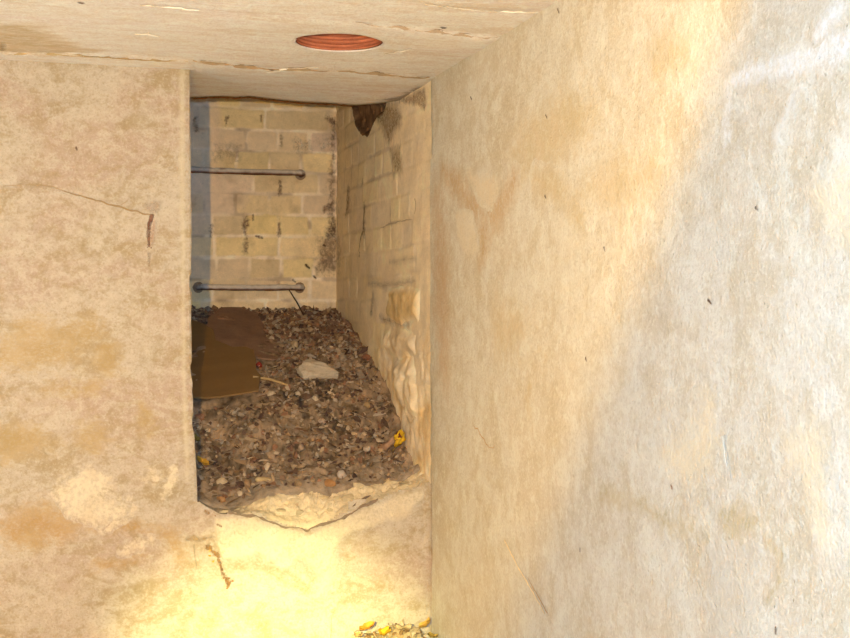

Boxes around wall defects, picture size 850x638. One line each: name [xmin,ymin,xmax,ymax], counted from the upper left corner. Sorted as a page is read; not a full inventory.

spalling [351,103,386,137]
leakage [377,87,425,141]
crack [8,184,150,215]
rust [147,203,157,261]
leakage [305,172,336,278]
rust [186,536,234,589]
peeling [197,470,429,603]